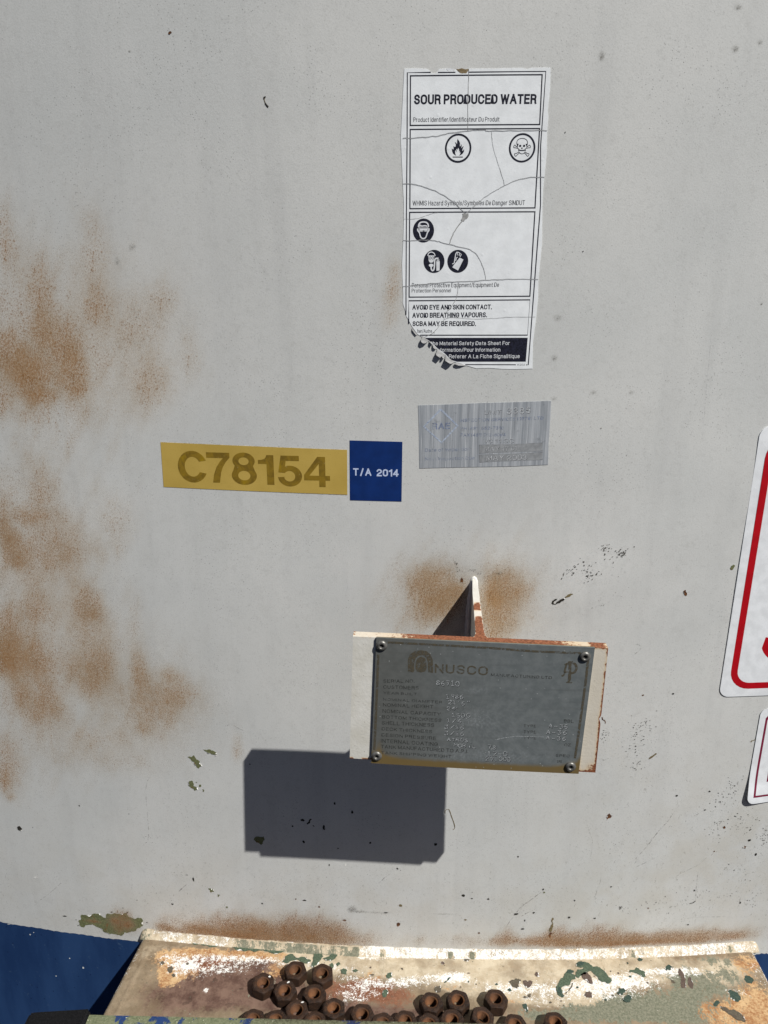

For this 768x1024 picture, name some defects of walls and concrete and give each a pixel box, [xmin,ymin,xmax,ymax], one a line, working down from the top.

rust [0,211,170,444]
rust [0,468,196,769]
peeling [188,749,217,768]
peeling [78,910,147,936]
rust [161,912,376,945]
rust [490,925,755,949]
peeling [495,972,540,1013]
peeling [549,958,648,1003]
peeling [665,965,694,989]
peeling [714,989,746,1022]